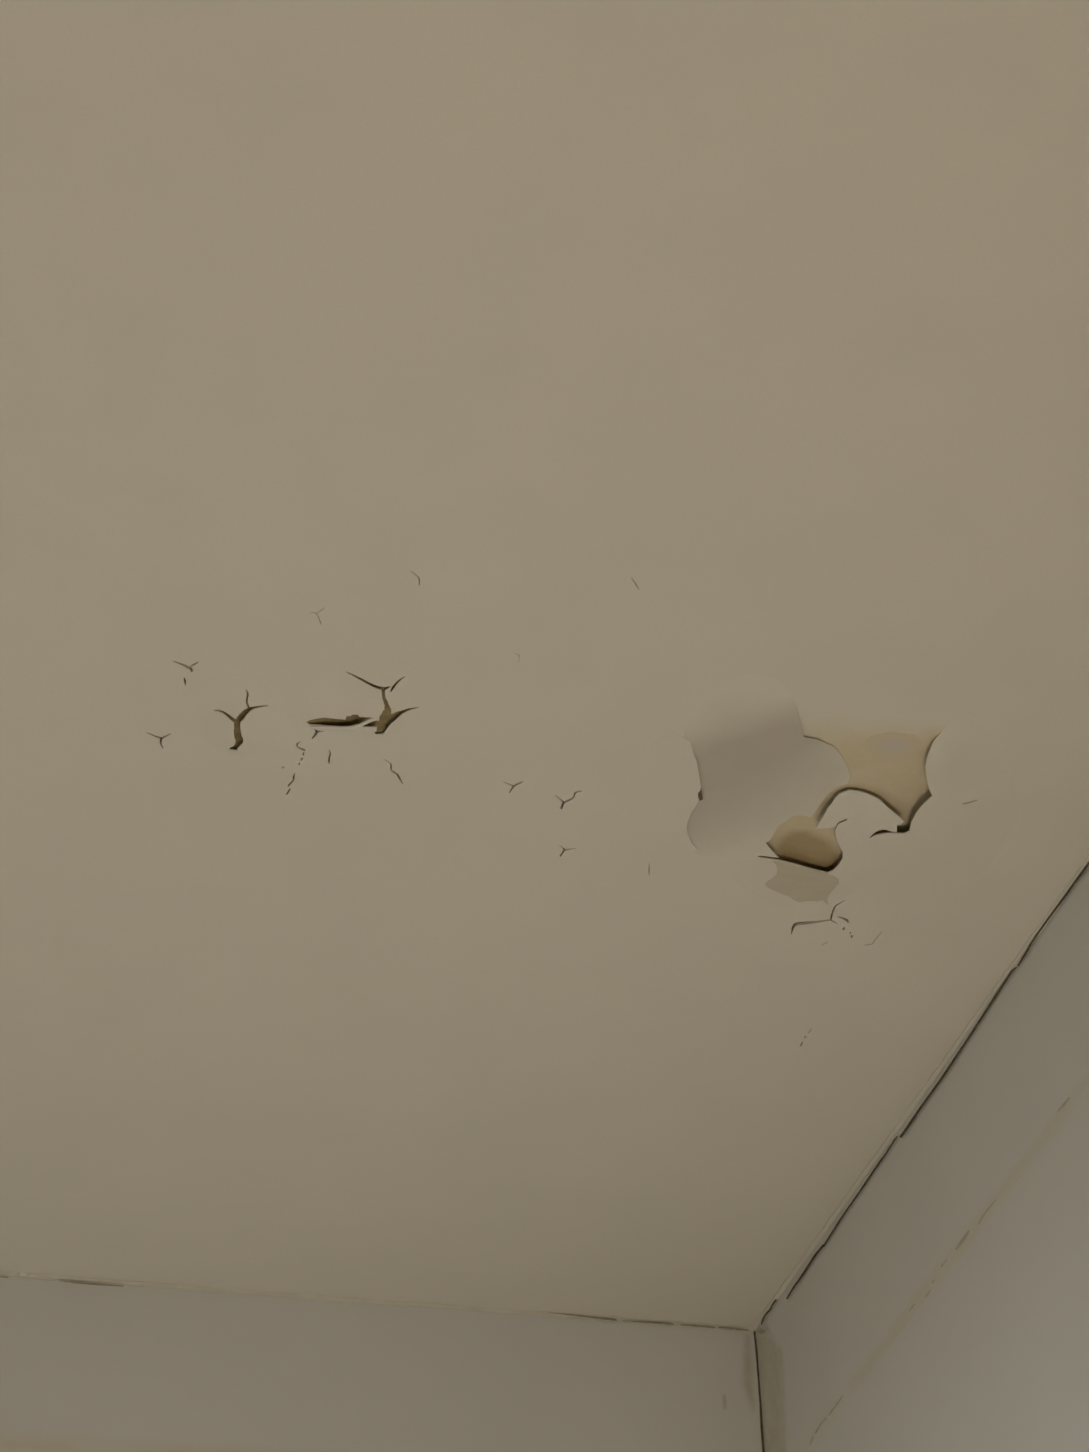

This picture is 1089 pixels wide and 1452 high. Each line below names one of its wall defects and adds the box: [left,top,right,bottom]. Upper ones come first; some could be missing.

crack [219,690,260,749]
crack [289,672,413,789]
peeling [628,673,1017,912]
crack [548,862,1089,1452]
crack [59,1279,124,1287]